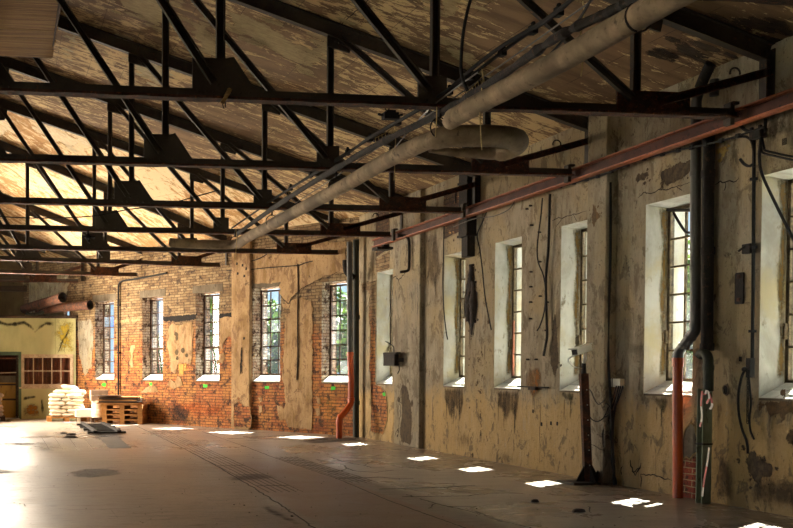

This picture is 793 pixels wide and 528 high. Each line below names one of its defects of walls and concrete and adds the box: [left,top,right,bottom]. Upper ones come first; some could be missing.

peeling [110,0,228,58]
peeling [122,57,174,87]
peeling [225,12,337,78]
peeling [440,37,501,78]
peeling [645,36,738,64]
peeling [0,119,15,137]
peeling [32,124,91,154]
peeling [660,160,690,190]
flaking render [233,397,260,429]
water stain [445,389,463,418]
water stain [498,392,518,428]
water stain [754,481,793,505]